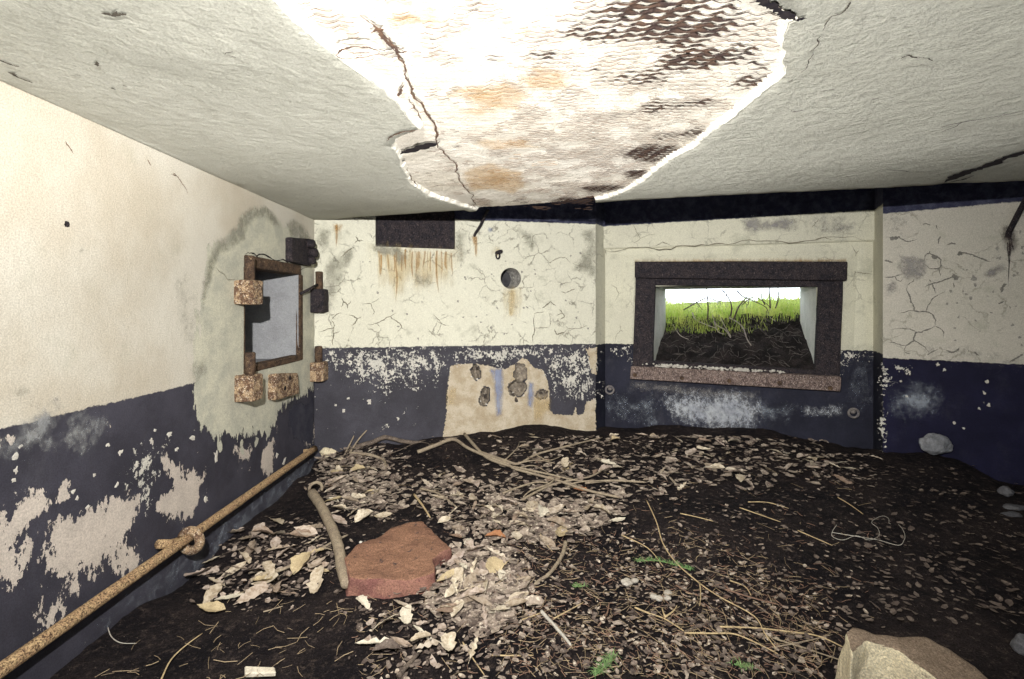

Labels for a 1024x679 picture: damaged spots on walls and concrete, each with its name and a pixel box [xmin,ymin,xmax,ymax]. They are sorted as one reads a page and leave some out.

crack [336,15,478,210]
crack [887,151,1024,182]
leakage [206,209,277,285]
crack [321,297,403,344]
rust [379,249,446,279]
crack [532,257,585,341]
crack [605,219,990,355]
peeling [0,413,50,483]
peeling [233,437,286,476]
flaking render [325,324,633,437]
leakage [666,394,759,428]
peeling [0,429,208,634]